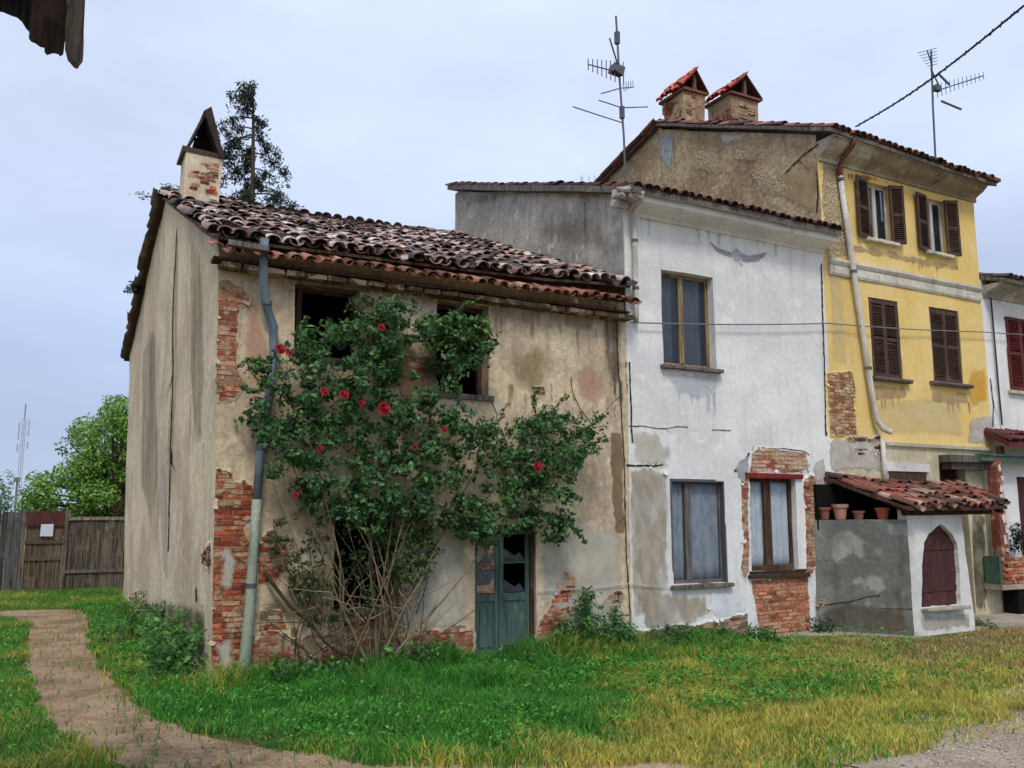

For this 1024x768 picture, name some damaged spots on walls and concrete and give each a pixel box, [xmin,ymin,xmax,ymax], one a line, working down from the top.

flaking render [687,131,768,176]
crack [167,229,177,551]
flaking render [214,277,253,404]
peeling [825,275,961,471]
flaking render [200,467,476,674]
peeling [535,432,669,643]
flaking render [636,445,827,640]